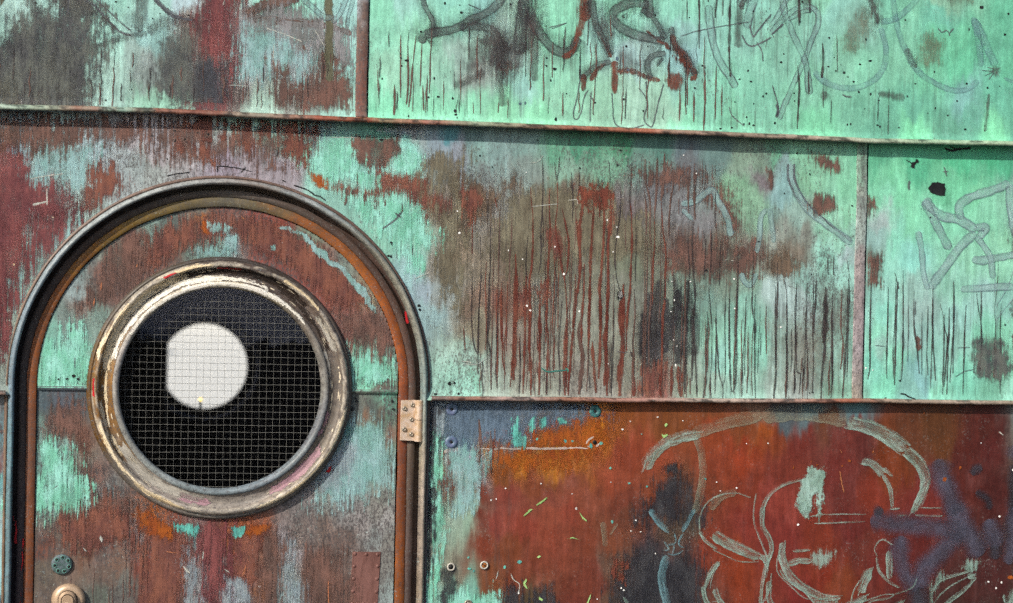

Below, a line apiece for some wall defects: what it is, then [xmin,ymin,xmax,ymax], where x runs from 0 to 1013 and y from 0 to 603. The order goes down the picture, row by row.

rust [174,0,248,111]
rust [310,171,328,190]
rust [573,182,616,236]
rust [487,414,610,474]
rust [437,450,460,511]
rust [137,508,173,540]
rust [186,518,270,603]